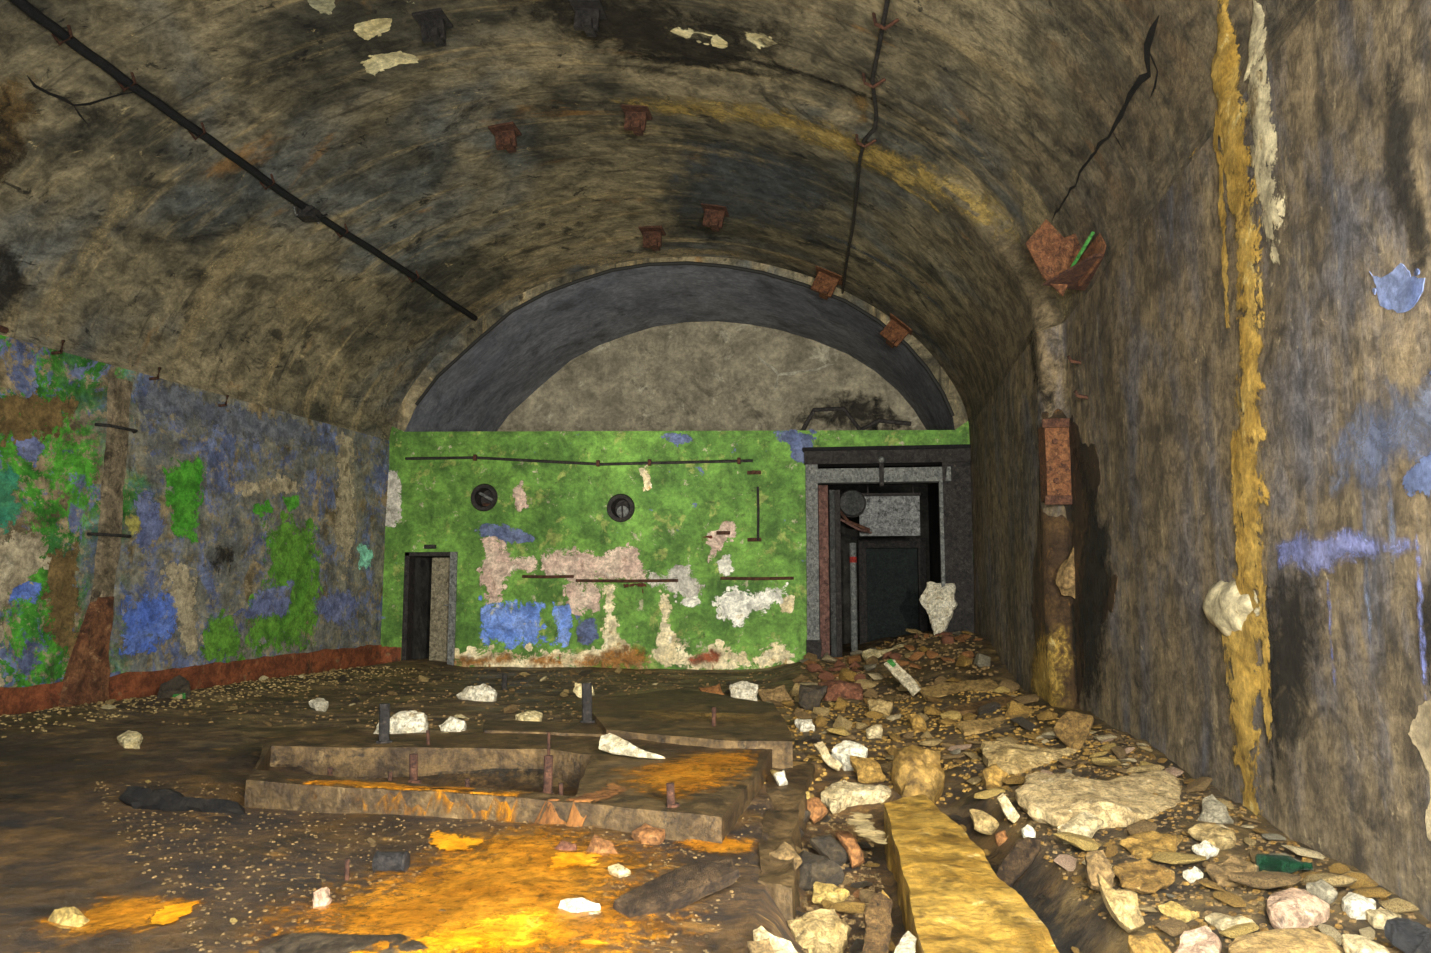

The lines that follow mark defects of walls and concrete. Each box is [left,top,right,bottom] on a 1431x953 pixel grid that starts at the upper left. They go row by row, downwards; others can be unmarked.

flaking render [307,0,336,15]
flaking render [354,18,419,76]
leakage [519,0,917,123]
crack [1052,15,1159,220]
peeling [1369,263,1425,313]
corrosion [1189,0,1273,818]
peeling [1402,451,1431,497]
peeling [454,480,795,670]
flaking render [1408,699,1431,841]